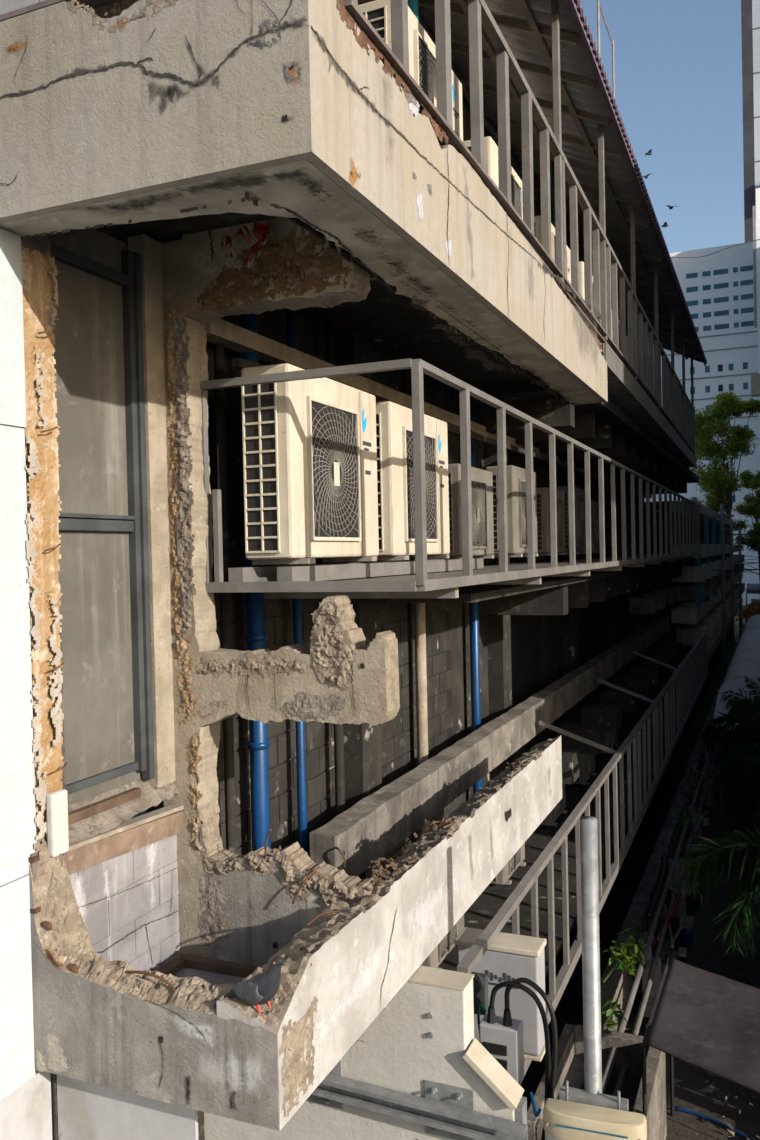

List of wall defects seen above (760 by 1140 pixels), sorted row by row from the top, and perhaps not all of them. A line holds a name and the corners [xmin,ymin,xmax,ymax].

spalling [67,0,176,33]
crack [0,0,606,347]
spalling [228,192,258,207]
spalling [289,218,351,262]
peeling [21,229,70,840]
peeling [163,302,228,851]
spalling [281,692,346,722]
peeling [76,880,84,916]
spalling [198,871,232,948]
peeling [290,866,340,929]
spalling [124,971,176,992]